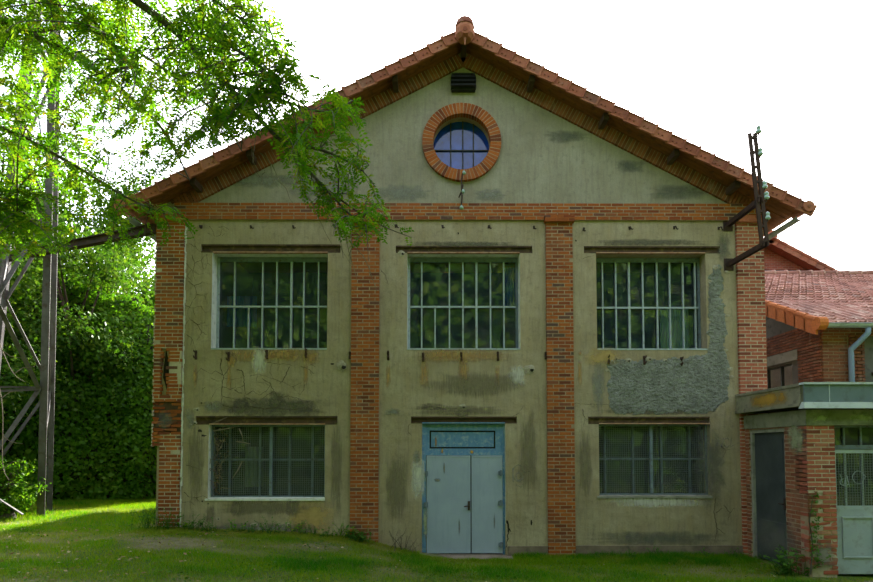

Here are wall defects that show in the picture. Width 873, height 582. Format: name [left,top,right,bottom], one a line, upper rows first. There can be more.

crack [185,226,316,412]
peeling [605,265,734,415]